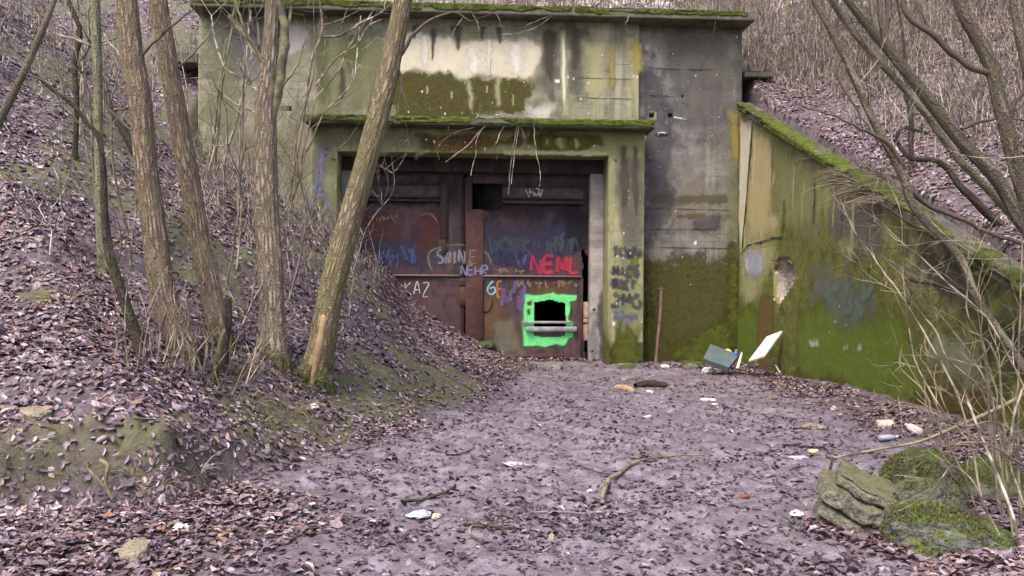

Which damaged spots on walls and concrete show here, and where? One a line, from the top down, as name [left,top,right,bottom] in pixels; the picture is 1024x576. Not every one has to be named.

leakage [400,24,615,118]
leakage [503,31,815,359]
leakage [830,180,881,255]
rust [483,294,507,337]
rust [530,283,574,294]
spalling [773,256,796,307]
leakage [904,237,1024,387]